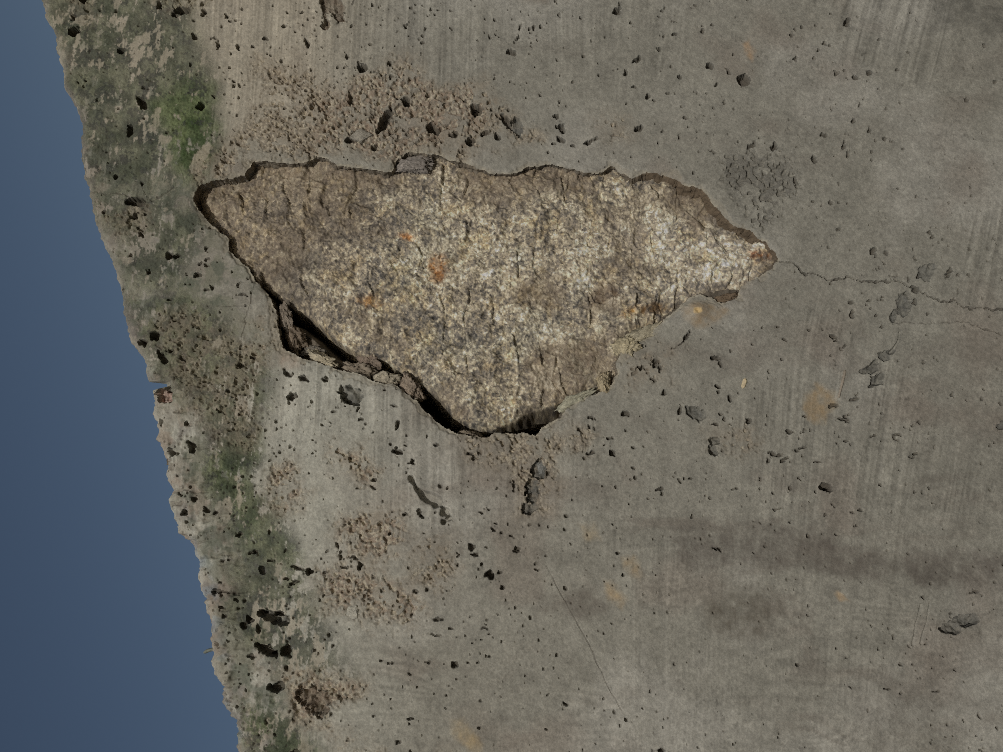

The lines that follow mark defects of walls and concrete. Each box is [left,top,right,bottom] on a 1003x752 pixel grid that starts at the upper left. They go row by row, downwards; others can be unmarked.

spalling [193,246,214,292]
spalling [251,273,486,438]
spalling [193,140,802,281]
spalling [530,289,739,436]
spalling [677,404,726,456]
crack [776,260,1003,336]